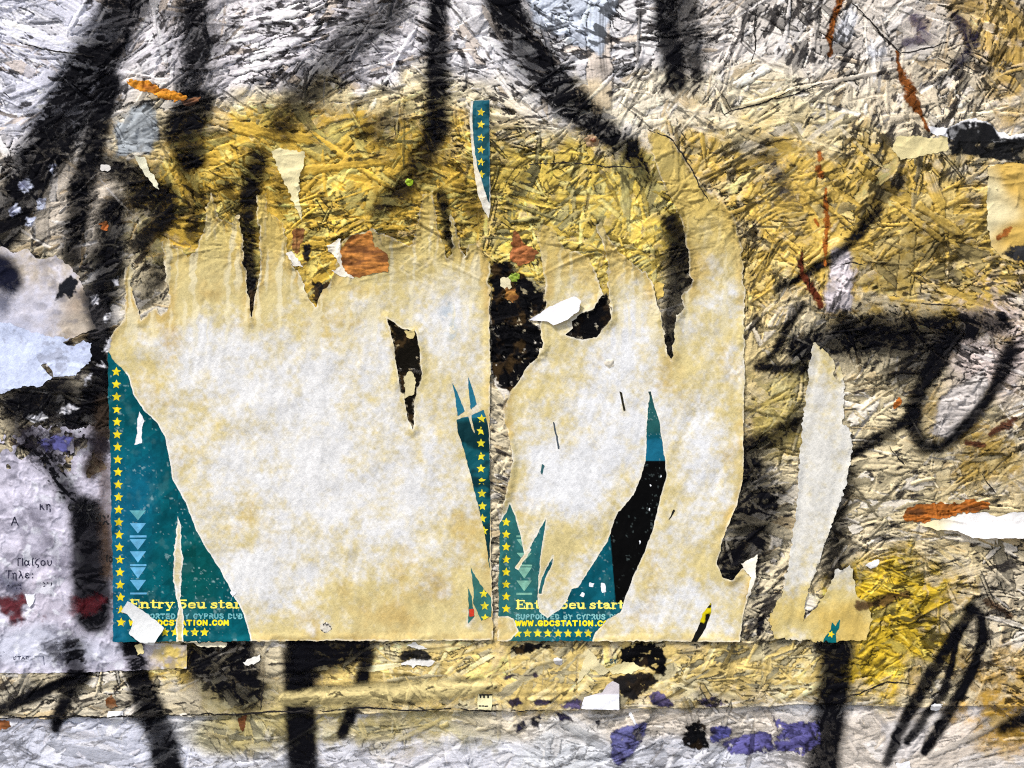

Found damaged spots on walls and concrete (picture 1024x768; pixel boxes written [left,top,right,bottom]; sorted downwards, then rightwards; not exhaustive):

peeling [292,228,305,254]
peeling [340,231,389,278]
peeling [509,231,539,266]
peeling [504,287,519,303]
peeling [28,412,48,423]
peeling [60,404,79,414]